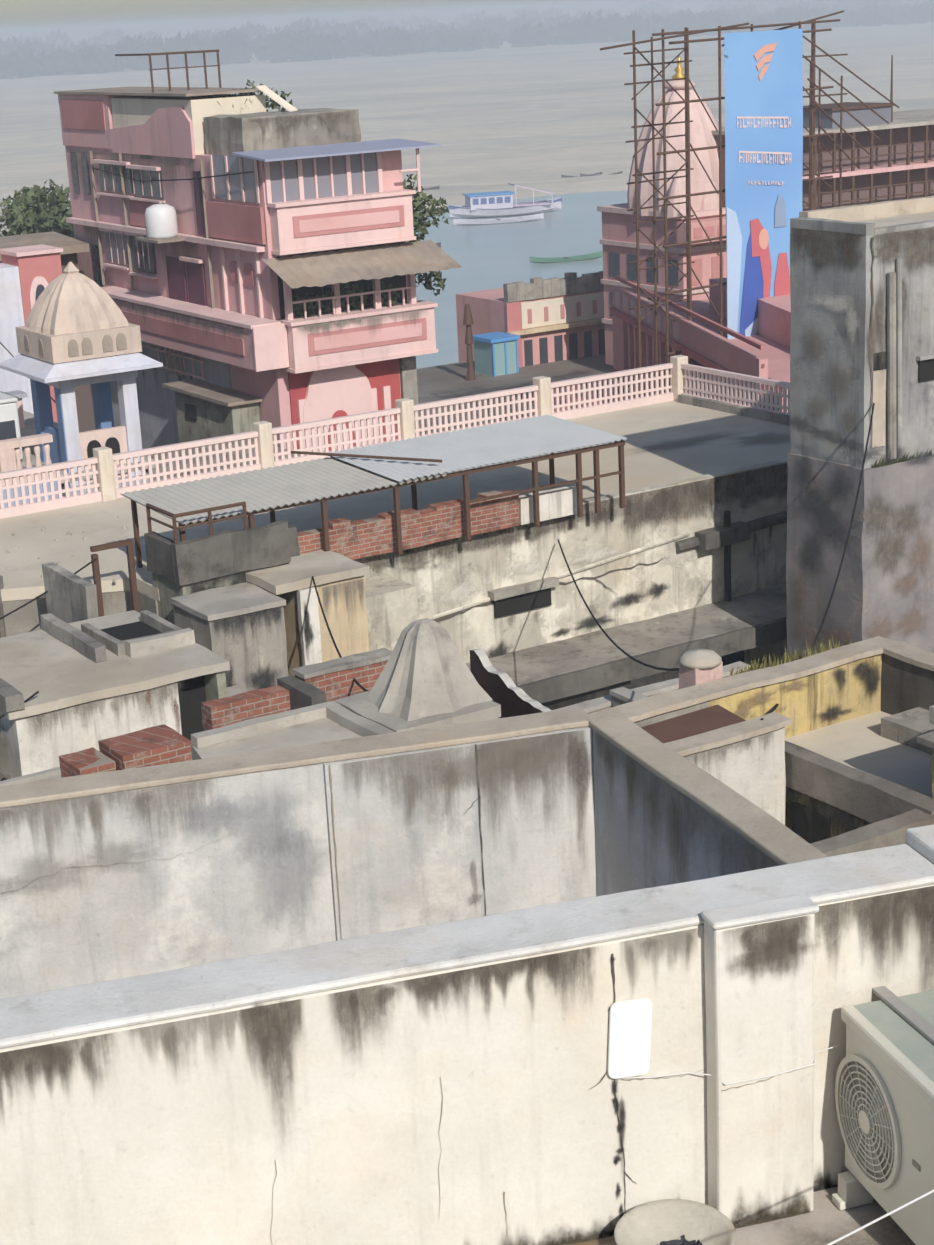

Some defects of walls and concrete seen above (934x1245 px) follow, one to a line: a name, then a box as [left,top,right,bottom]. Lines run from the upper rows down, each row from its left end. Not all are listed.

water stain [792,227,934,337]
water stain [821,707,851,720]
water stain [835,663,880,696]
water stain [2,780,205,836]
water stain [741,886,934,979]
water stain [333,947,591,1044]
crack [609,954,617,1003]
water stain [0,1034,107,1101]
water stain [139,999,301,1094]
water stain [612,1082,625,1165]
crack [589,1066,811,1214]
water stain [544,1185,623,1245]